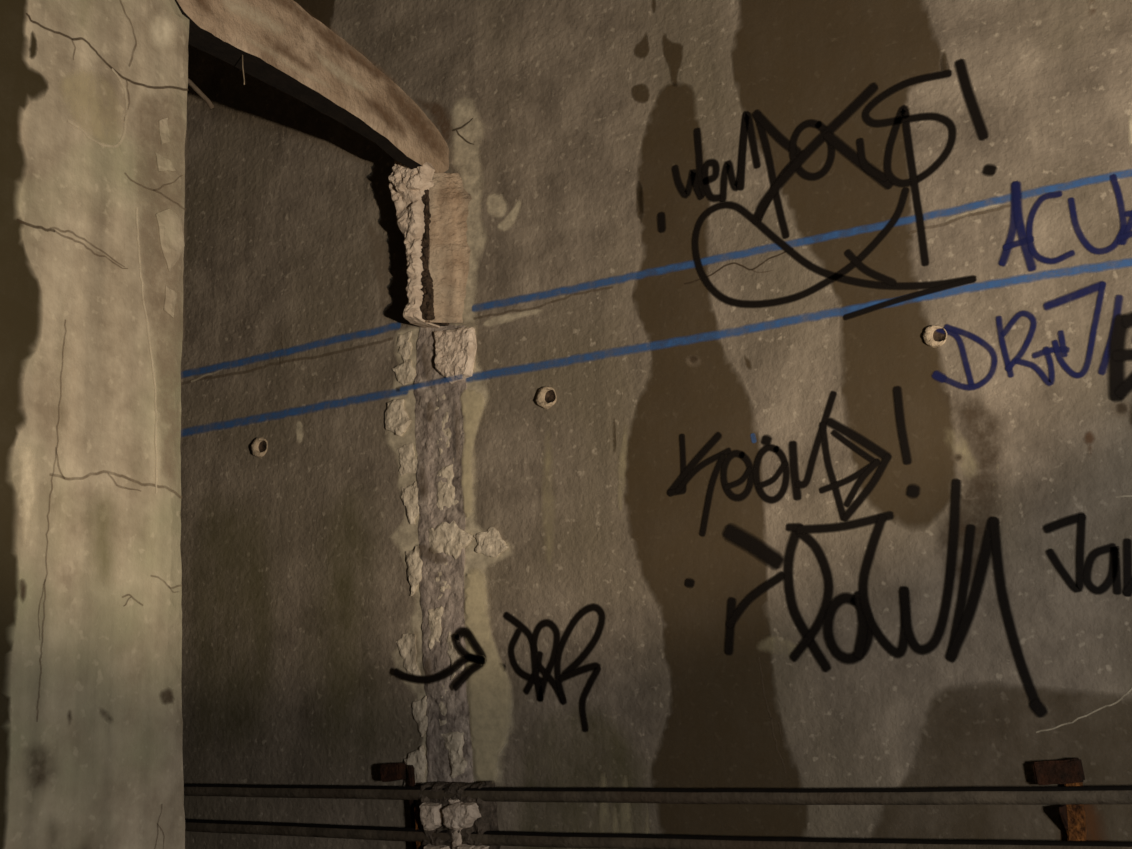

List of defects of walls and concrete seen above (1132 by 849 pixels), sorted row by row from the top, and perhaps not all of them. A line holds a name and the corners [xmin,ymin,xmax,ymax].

crack [26,13,188,91]
crack [17,219,72,239]
leakage [614,35,800,789]
spalling [385,90,520,849]
leakage [659,803,806,837]